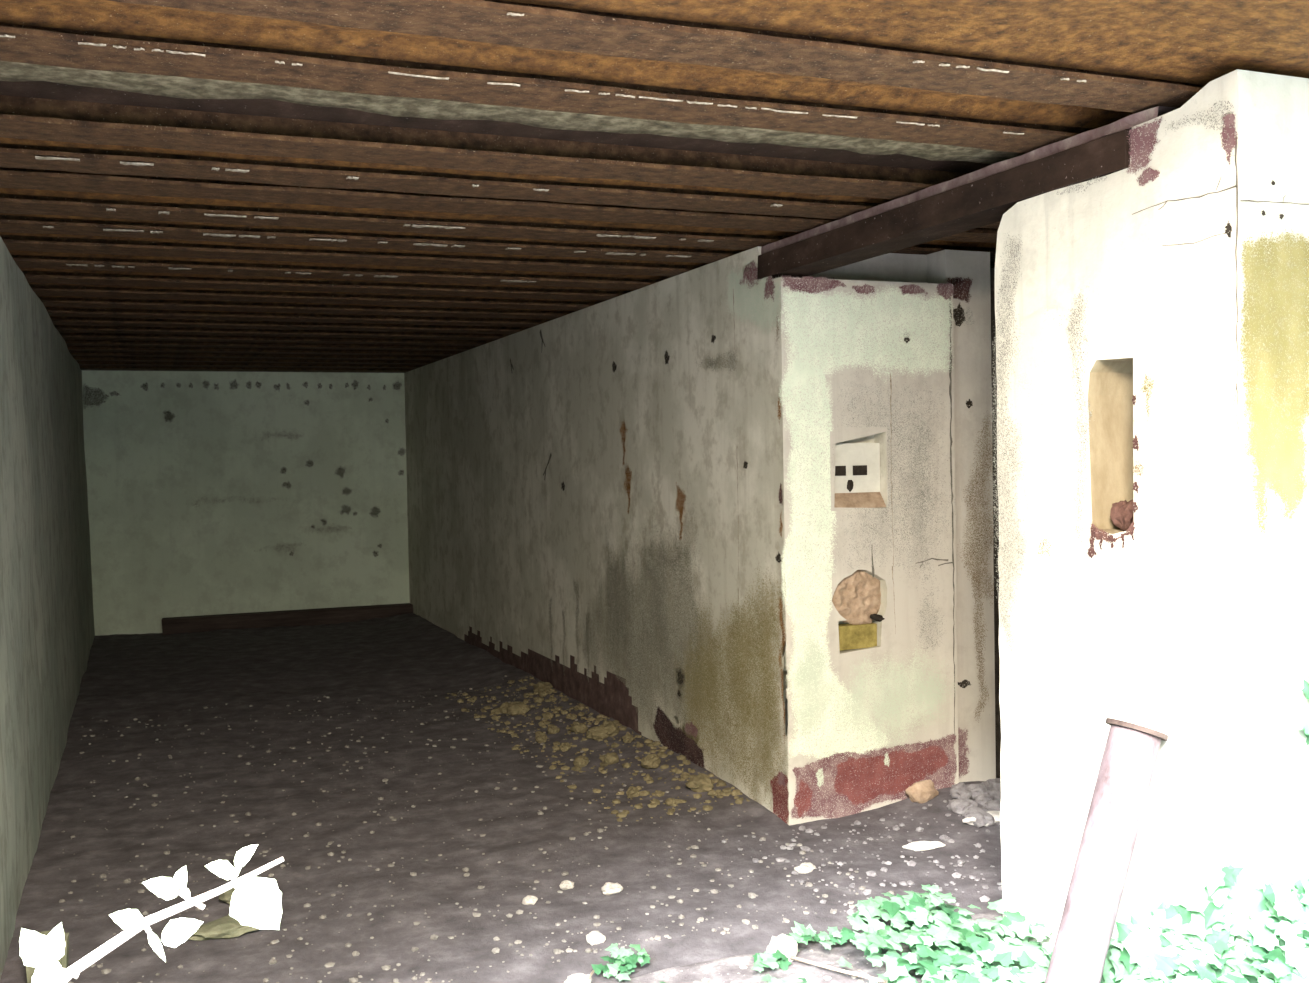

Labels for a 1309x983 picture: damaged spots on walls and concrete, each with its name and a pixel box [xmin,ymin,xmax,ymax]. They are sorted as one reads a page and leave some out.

peeling [1057,175,1107,195]
peeling [1127,98,1238,186]
water stain [1238,229,1309,537]
spalling [464,626,706,769]
water stain [549,493,791,810]
peeling [726,258,974,825]